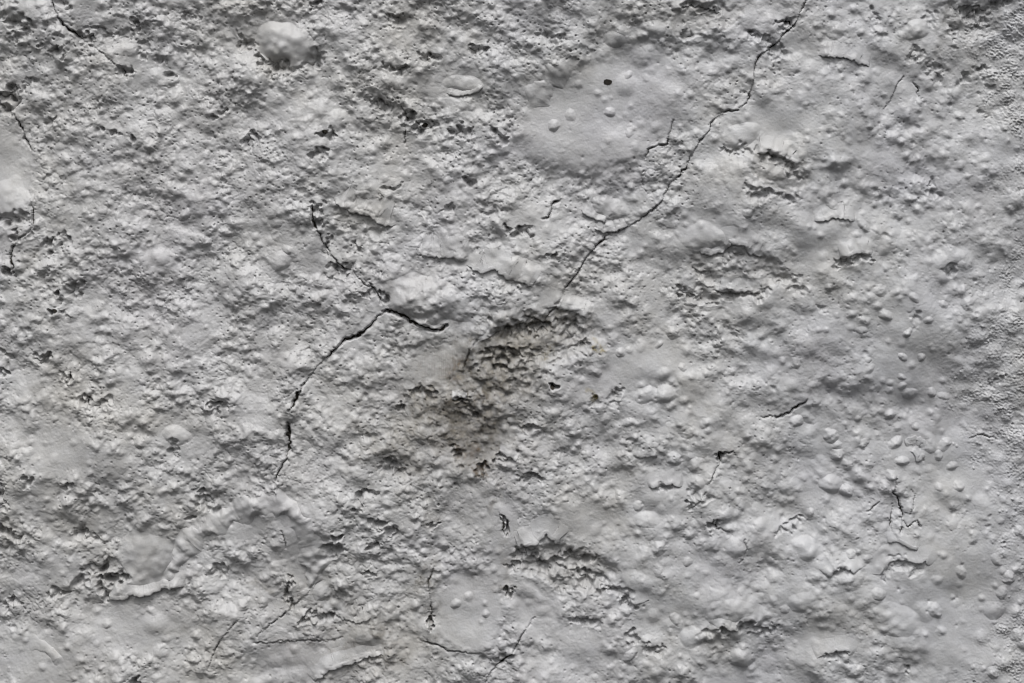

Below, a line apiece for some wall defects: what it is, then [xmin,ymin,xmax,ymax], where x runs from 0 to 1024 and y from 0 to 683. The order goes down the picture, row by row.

crack [52,0,126,73]
crack [541,0,807,329]
crack [274,205,447,492]